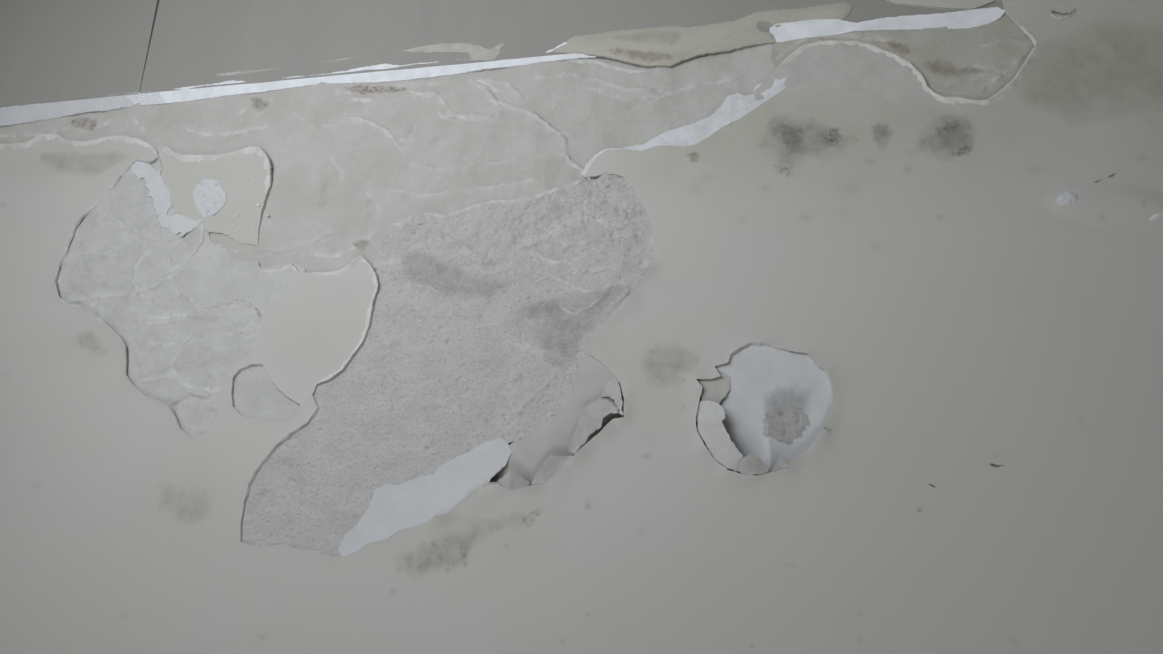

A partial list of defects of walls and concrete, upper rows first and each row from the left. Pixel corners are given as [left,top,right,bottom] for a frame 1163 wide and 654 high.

spalling [0,7,1040,558]